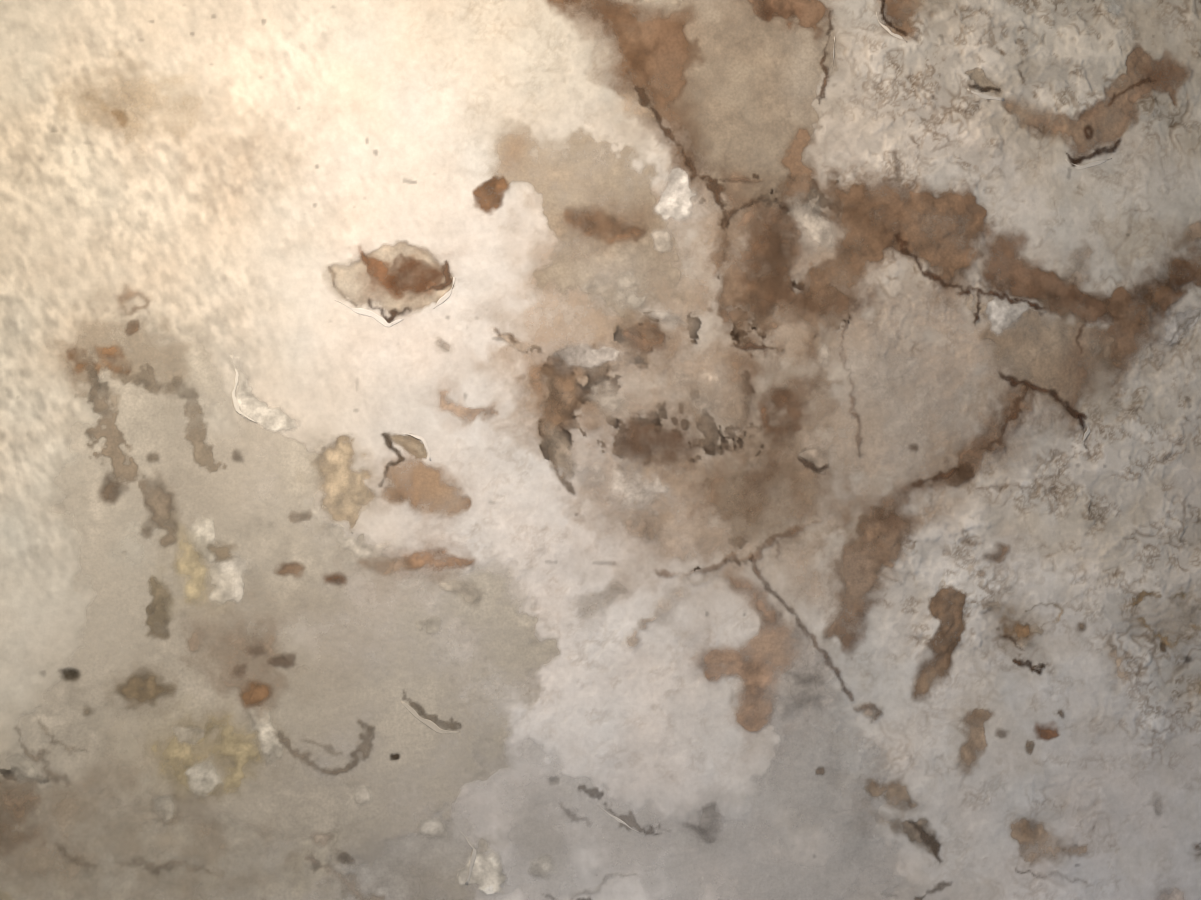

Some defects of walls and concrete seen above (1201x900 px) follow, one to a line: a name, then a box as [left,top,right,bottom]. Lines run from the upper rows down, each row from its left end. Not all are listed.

flaking render [876,0,925,42]
flaking render [965,46,1189,170]
crack [635,87,758,237]
flaking render [329,242,455,327]
crack [896,234,1047,323]
leakage [440,391,497,421]
leakage [473,0,1201,732]
crack [992,374,1091,444]
leakage [146,577,170,638]
peeling [0,342,560,900]
crack [704,526,853,701]
leakage [118,672,174,703]